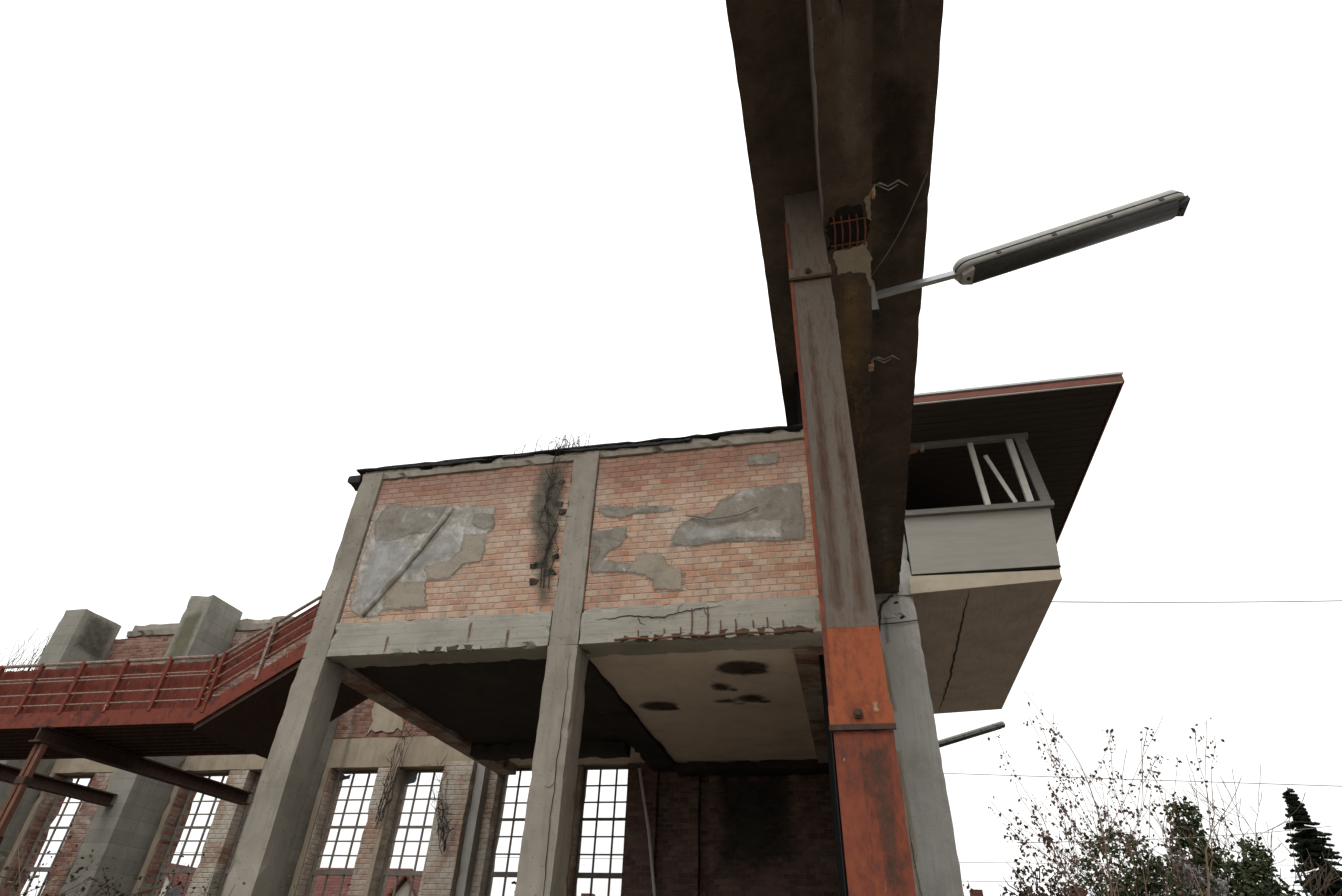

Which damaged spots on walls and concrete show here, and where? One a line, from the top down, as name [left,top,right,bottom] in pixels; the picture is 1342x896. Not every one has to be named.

flaking render [350,503,495,618]
leakage [531,468,562,601]
flaking render [590,483,806,590]
spalling [614,606,814,643]
leakage [712,661,770,704]